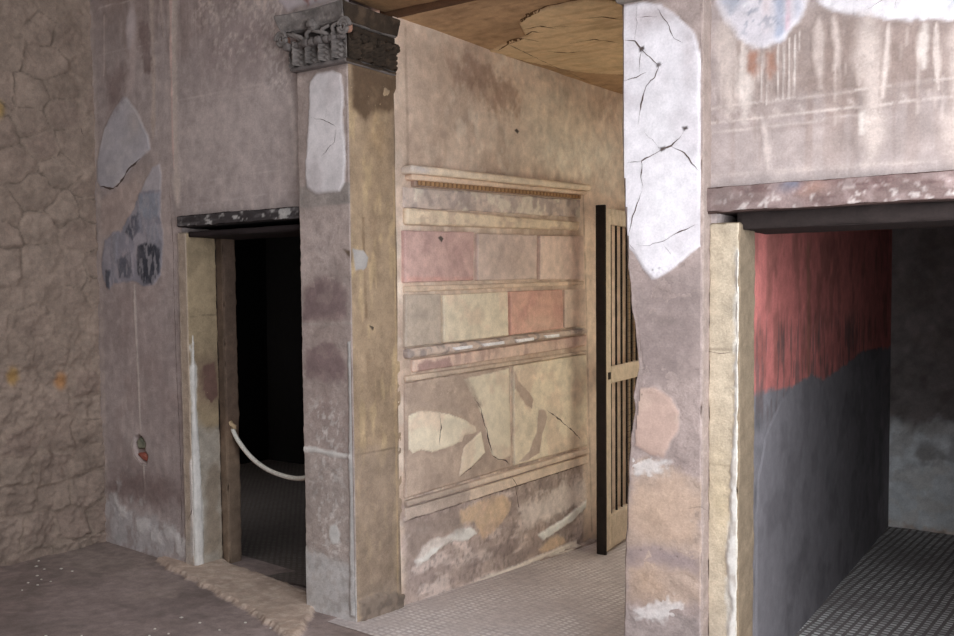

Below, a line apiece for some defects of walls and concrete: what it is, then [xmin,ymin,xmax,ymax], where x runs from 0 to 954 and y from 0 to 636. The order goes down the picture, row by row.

crack [624,7,699,254]
leakage [711,4,897,176]
leakage [912,11,954,171]
crack [408,400,584,521]